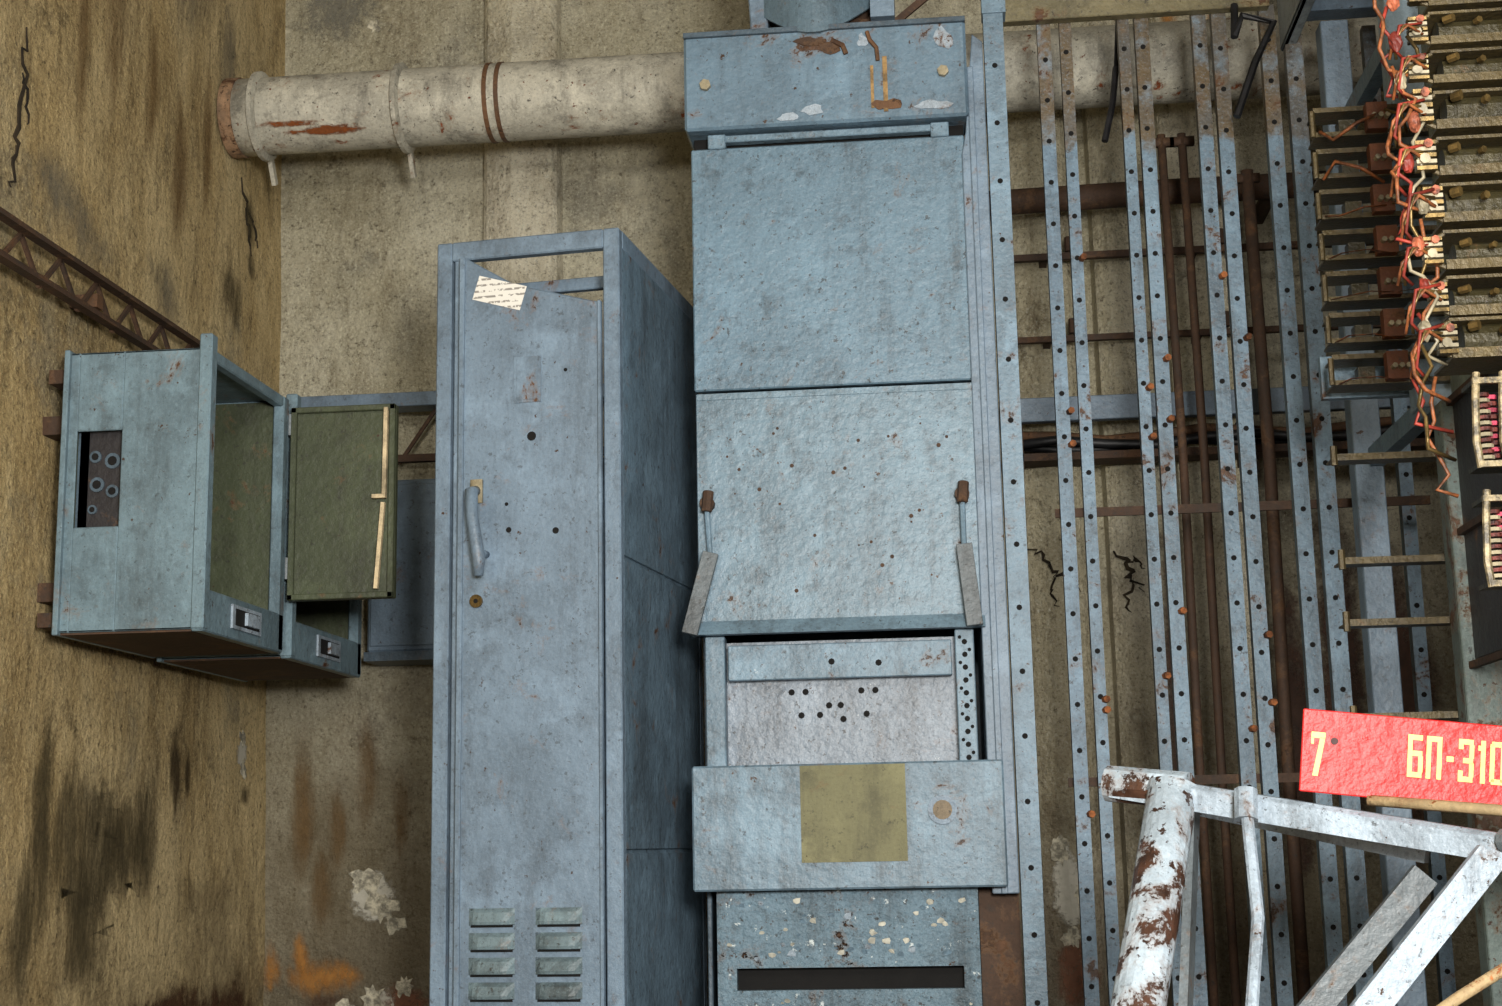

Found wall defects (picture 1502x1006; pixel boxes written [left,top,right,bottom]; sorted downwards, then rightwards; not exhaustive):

crack [8,27,30,187]
crack [1027,549,1081,607]
crack [1113,551,1146,613]
leakage [171,738,190,812]
leakage [11,735,155,982]
leakage [146,981,249,1006]
corrosion [267,940,356,992]